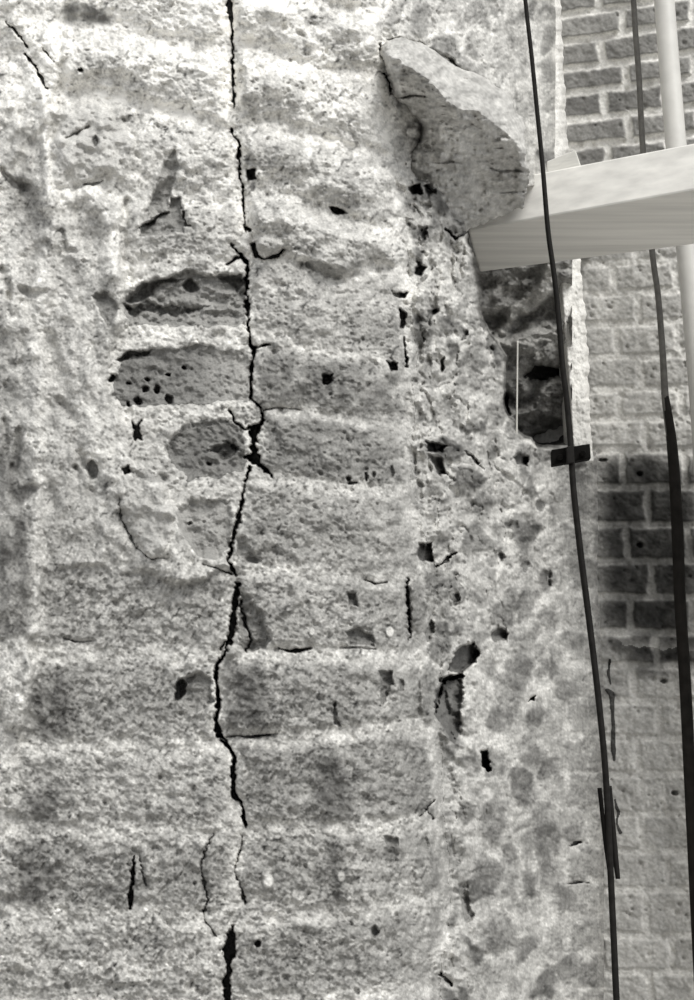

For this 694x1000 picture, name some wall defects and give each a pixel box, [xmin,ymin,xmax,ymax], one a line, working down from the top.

crack [11,27,49,89]
hole [408,184,436,196]
spalling [93,270,247,328]
spalling [108,344,251,407]
hole [524,365,559,380]
spalling [166,419,247,482]
crack [213,0,274,903]
hole [426,442,446,476]
hole [418,543,457,566]
hole [434,643,479,744]
crack [128,862,146,909]
crack [200,839,236,1000]